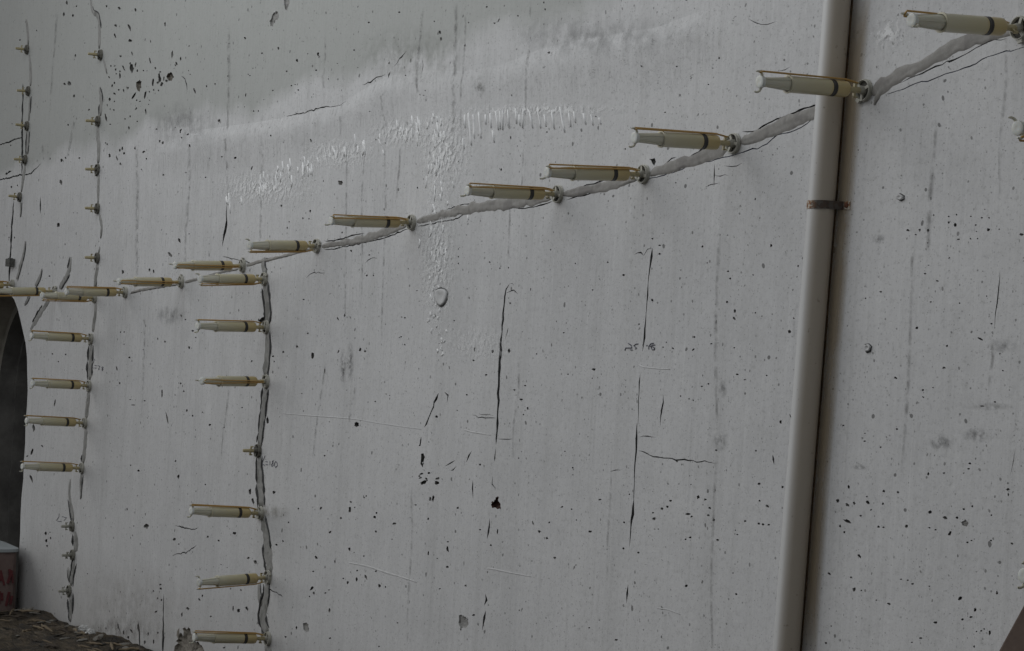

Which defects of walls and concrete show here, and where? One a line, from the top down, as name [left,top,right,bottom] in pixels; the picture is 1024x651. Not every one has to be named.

crack [0,0,107,622]
leakage [225,134,366,213]
crack [288,52,423,116]
crack [130,104,815,651]
efflorescence [379,106,601,356]
crack [871,31,1024,105]